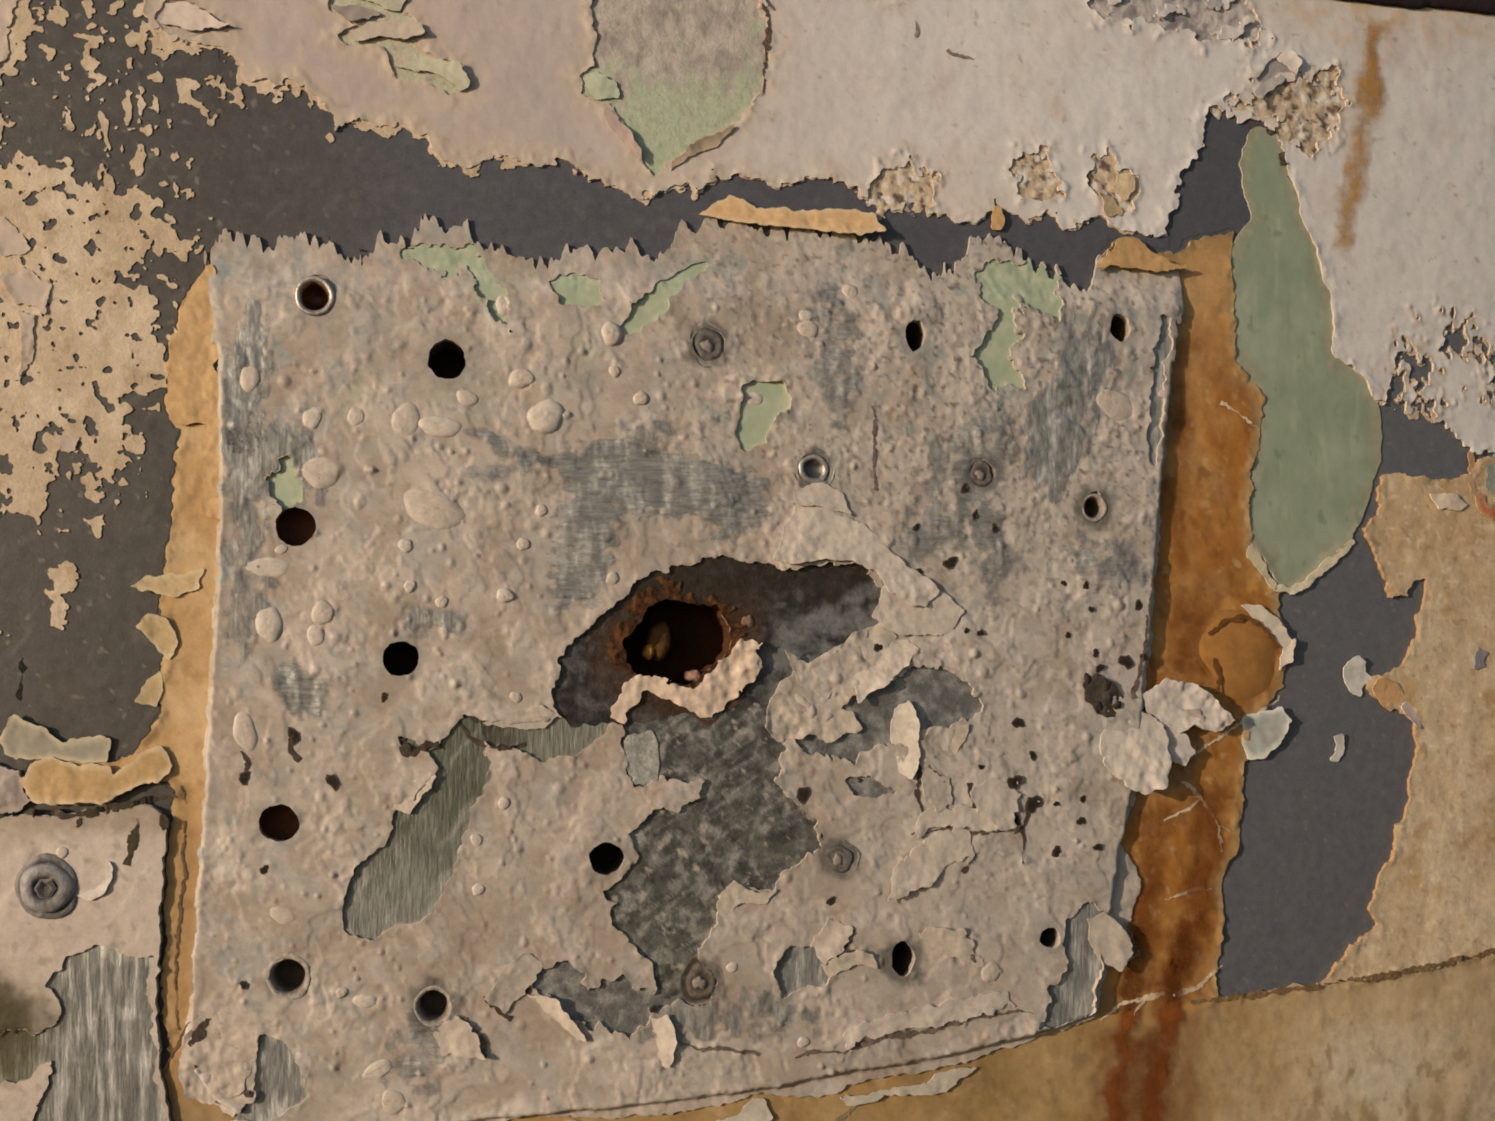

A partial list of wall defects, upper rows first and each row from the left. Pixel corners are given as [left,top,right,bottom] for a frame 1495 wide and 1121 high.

peeling [1087,0,1261,47]
rust [1340,31,1381,244]
peeling [0,0,1188,816]
peeling [1173,50,1495,997]
peeling [342,305,1116,1068]
peeling [1099,678,1235,795]
peeling [0,945,167,1121]
peeling [77,861,113,901]
peeling [178,1009,309,1121]
peeling [1039,902,1133,1028]
rust [1103,791,1224,1121]